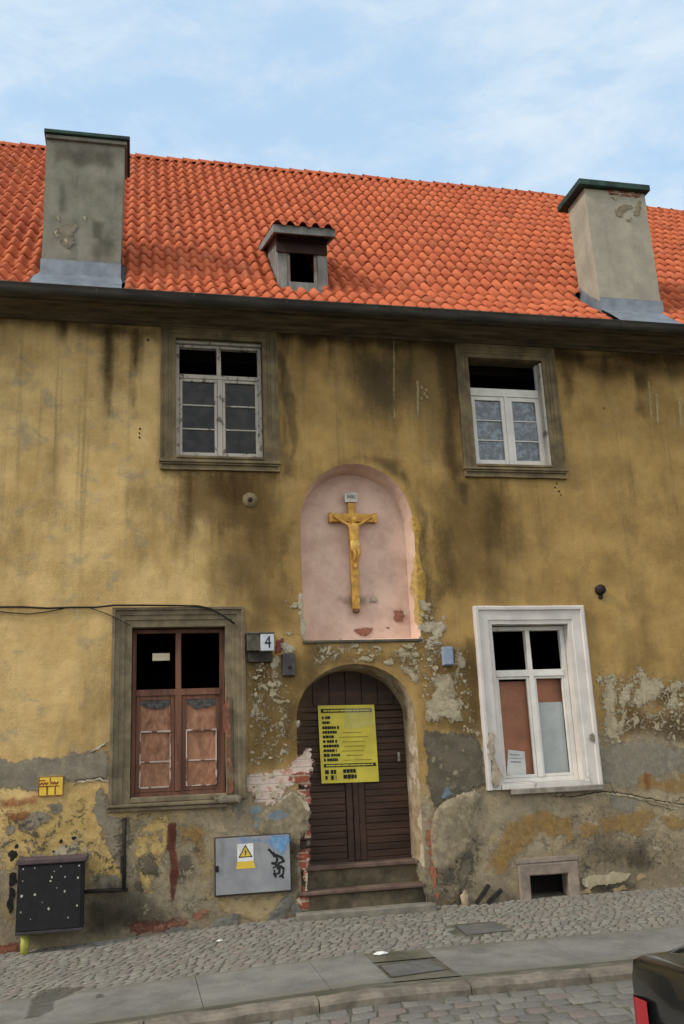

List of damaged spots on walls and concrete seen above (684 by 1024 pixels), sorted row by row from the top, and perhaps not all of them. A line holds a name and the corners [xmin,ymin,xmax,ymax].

flaking render [606,190,641,221]
leakage [57,321,154,372]
spalling [223,592,503,820]
peeling [590,659,684,749]
crack [555,784,684,810]
flaking render [0,785,240,936]
peeling [425,795,487,904]